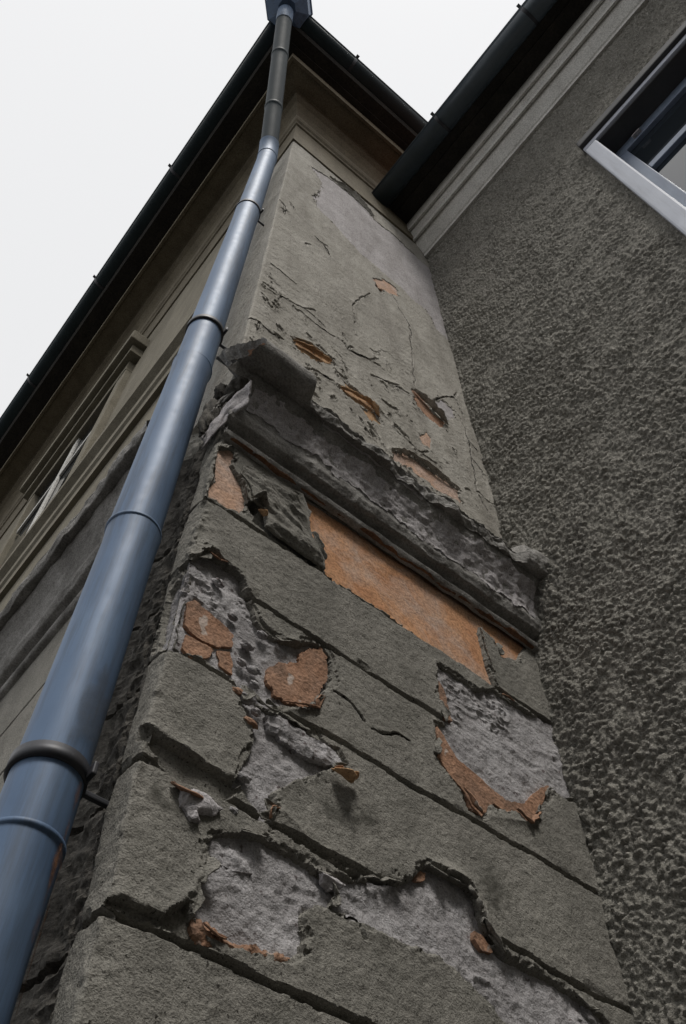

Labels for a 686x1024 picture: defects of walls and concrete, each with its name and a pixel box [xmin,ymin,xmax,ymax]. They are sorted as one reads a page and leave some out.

peeling [292,337,332,364]
crack [277,268,416,388]
peeling [198,376,536,619]
crack [436,394,482,502]
spalling [306,502,570,824]
spalling [162,551,602,1024]